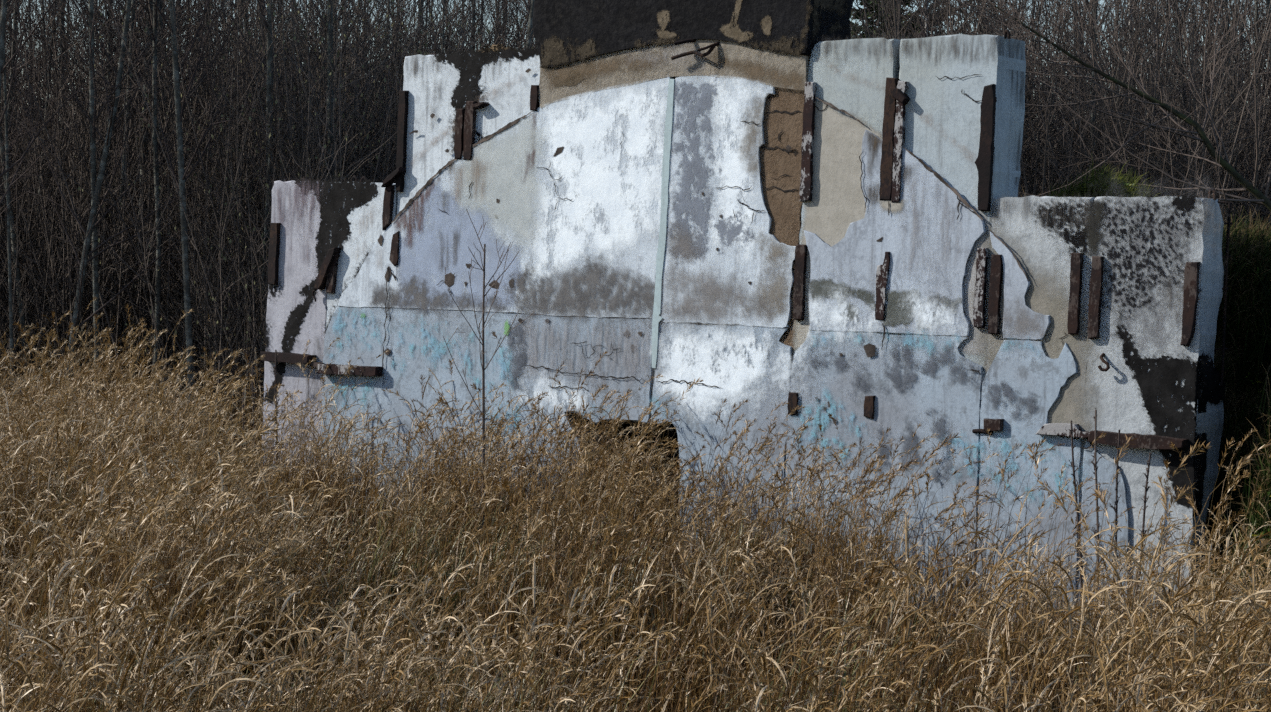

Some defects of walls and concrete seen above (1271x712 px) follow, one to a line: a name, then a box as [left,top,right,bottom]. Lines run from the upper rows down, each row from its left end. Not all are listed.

peeling [385,35,903,420]
leakage [261,177,378,404]
leakage [809,279,962,331]
peeling [489,373,586,432]
spalling [604,414,680,559]
peeling [797,392,860,458]
leakage [873,423,920,472]
leakage [810,341,1036,419]
leakage [926,409,954,447]
flaking render [903,209,1091,499]
leakage [1023,182,1225,517]